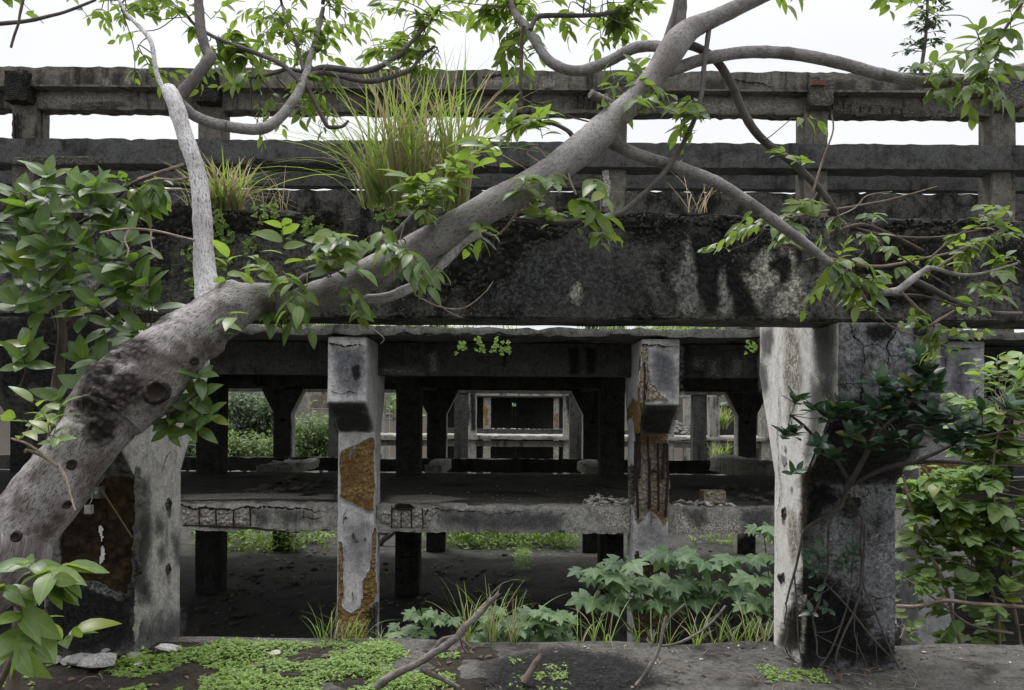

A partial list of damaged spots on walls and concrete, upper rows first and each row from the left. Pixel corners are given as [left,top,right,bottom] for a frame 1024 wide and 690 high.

spalling [53,466,146,641]
damp [181,493,335,524]
spalling [333,436,437,638]
spalling [626,345,670,526]
damp [670,234,942,670]
crack [815,323,911,387]